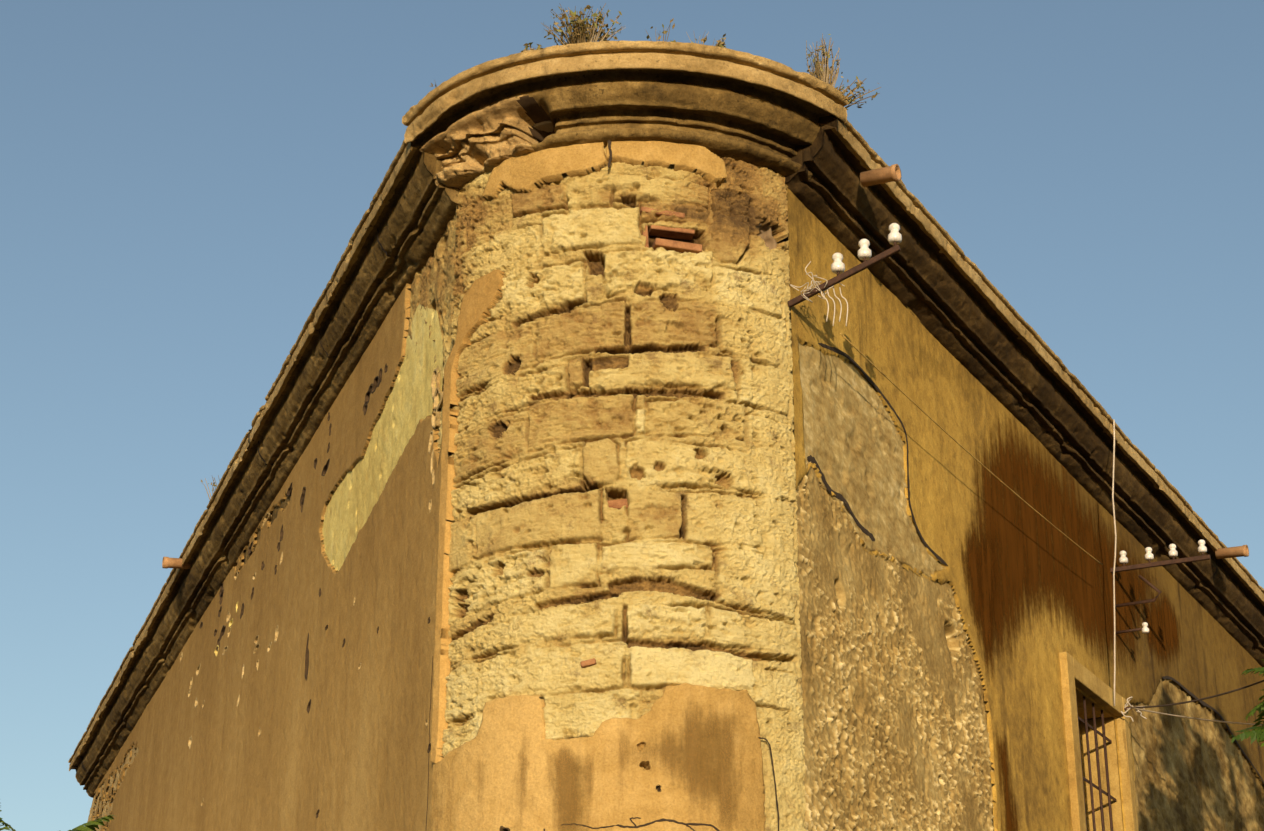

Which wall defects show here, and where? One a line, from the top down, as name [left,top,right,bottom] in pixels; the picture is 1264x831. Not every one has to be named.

spalling [188,664,205,709]
spalling [200,483,306,657]
spalling [242,625,279,678]
spalling [314,140,996,831]
leakage [962,424,1181,675]
spalling [1130,676,1264,831]